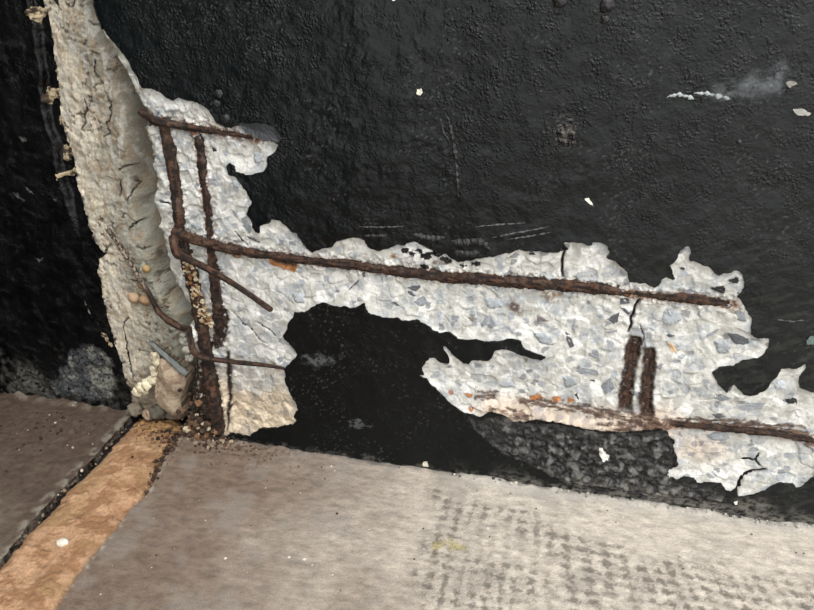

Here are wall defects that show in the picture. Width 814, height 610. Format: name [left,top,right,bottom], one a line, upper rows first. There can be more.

corrosion [182,262,233,431]
corrosion [269,259,298,272]
spalling [103,30,814,505]
corrosion [466,336,814,452]